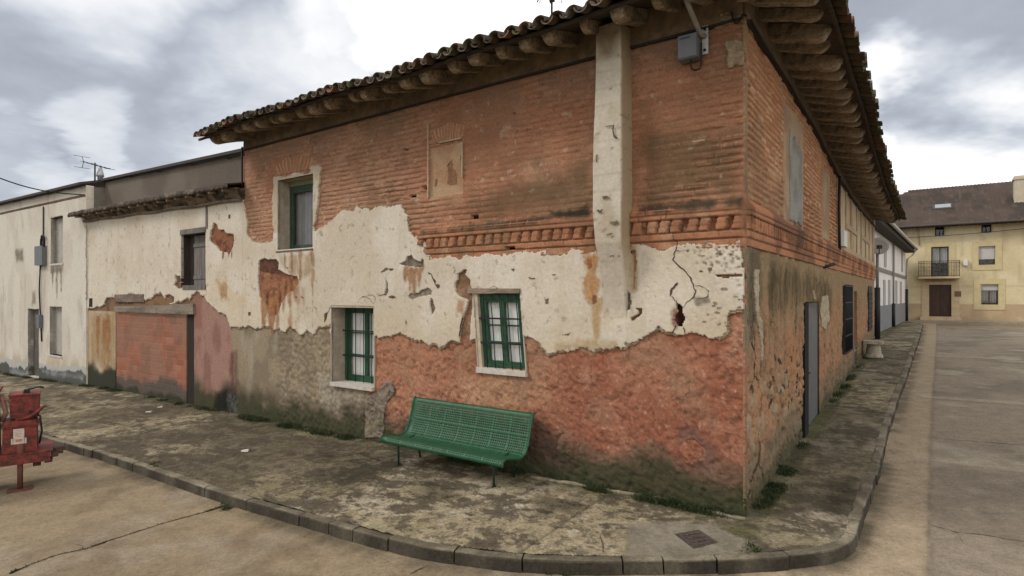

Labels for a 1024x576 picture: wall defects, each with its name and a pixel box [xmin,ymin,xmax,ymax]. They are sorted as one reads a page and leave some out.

flaking render [211,215,234,258]
flaking render [248,259,303,333]
flaking render [453,267,473,345]
crack [666,210,709,308]